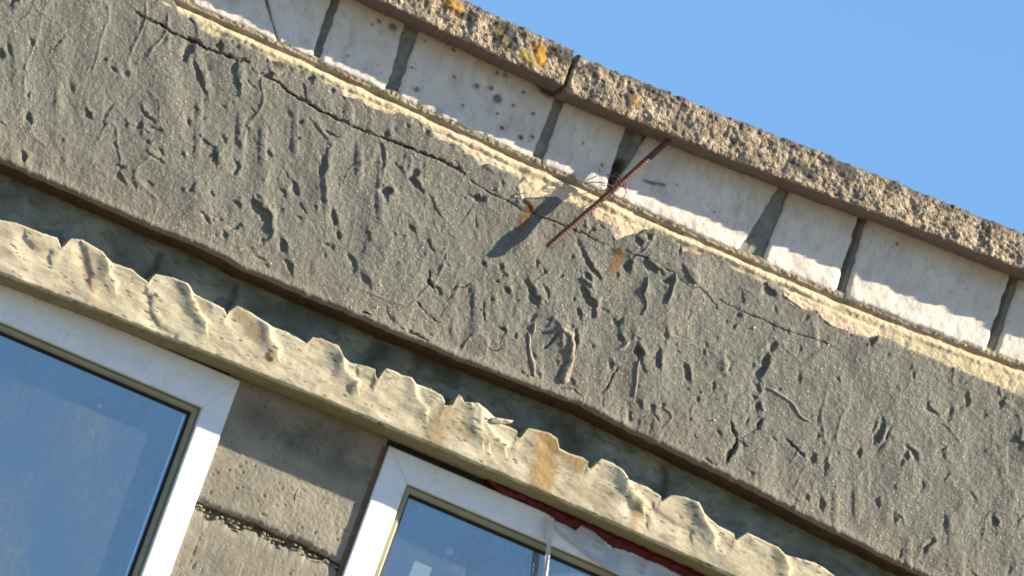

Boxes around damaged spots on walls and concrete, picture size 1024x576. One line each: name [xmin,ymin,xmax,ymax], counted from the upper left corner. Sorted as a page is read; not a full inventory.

crack [136,12,837,352]
corrosion [529,432,587,492]